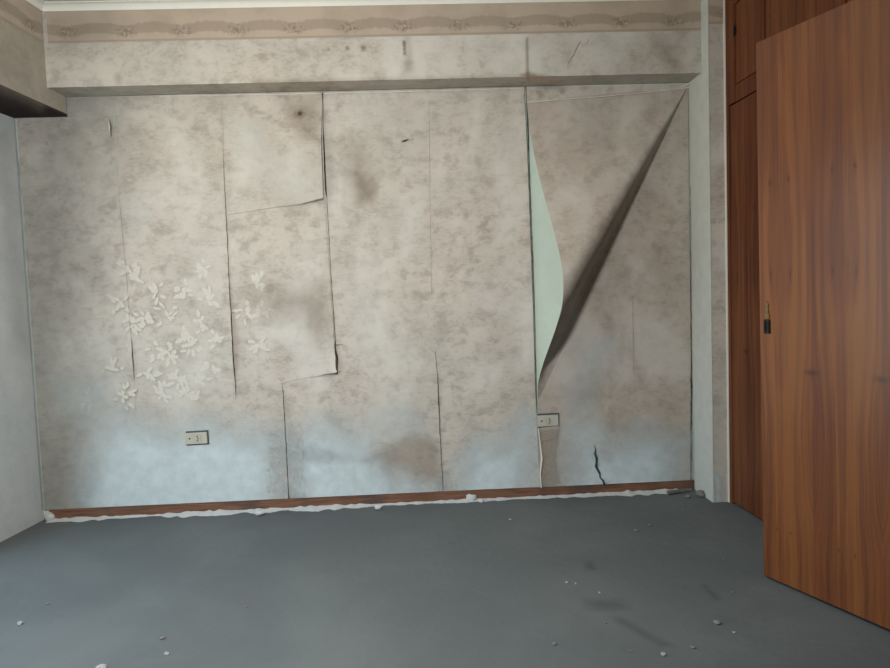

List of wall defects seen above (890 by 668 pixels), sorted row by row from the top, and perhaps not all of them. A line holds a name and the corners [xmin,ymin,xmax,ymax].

crack [594,445,610,485]